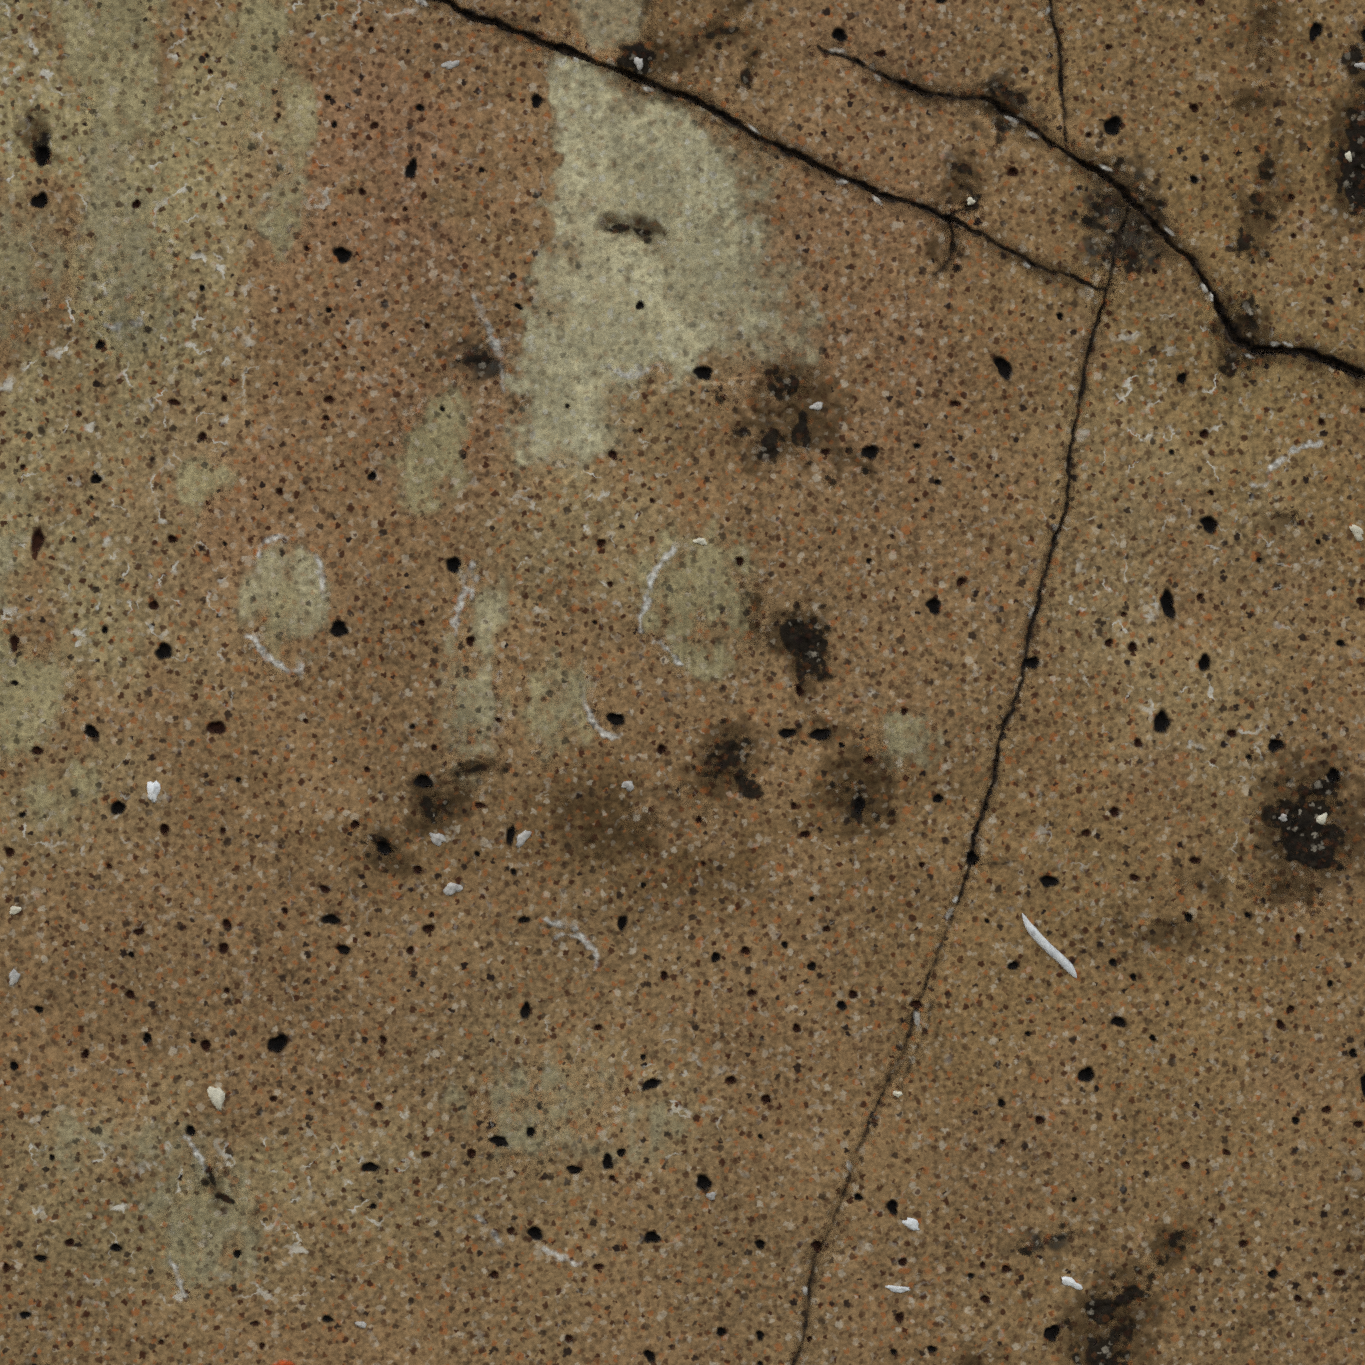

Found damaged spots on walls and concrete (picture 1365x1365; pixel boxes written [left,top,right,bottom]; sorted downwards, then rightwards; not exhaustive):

crack [416,0,1365,1151]
crack [792,1185,850,1365]